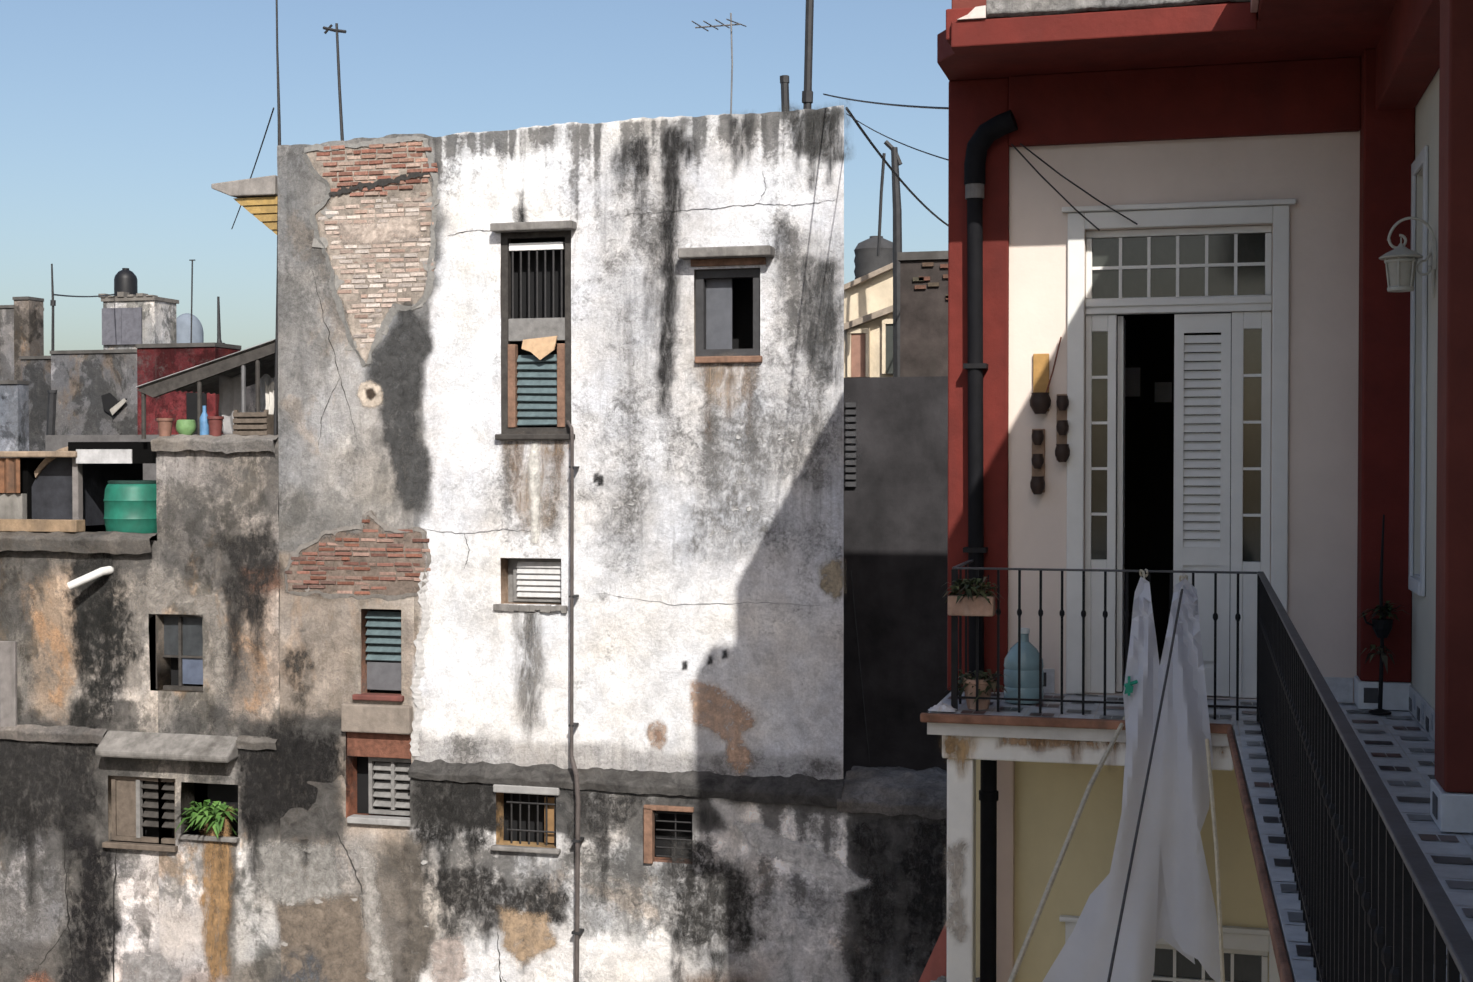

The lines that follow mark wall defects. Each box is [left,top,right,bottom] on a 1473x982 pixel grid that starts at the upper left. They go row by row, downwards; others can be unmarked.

water stain [784,106,847,174]
flaking render [303,135,441,408]
water stain [615,126,694,412]
water stain [368,303,432,510]
water stain [220,523,281,673]
flaking render [243,510,431,601]
water stain [237,650,350,872]
peeling [647,721,666,749]
peeling [682,661,754,773]
spalling [500,909,556,961]
water stain [667,840,762,981]
water stain [735,820,947,982]